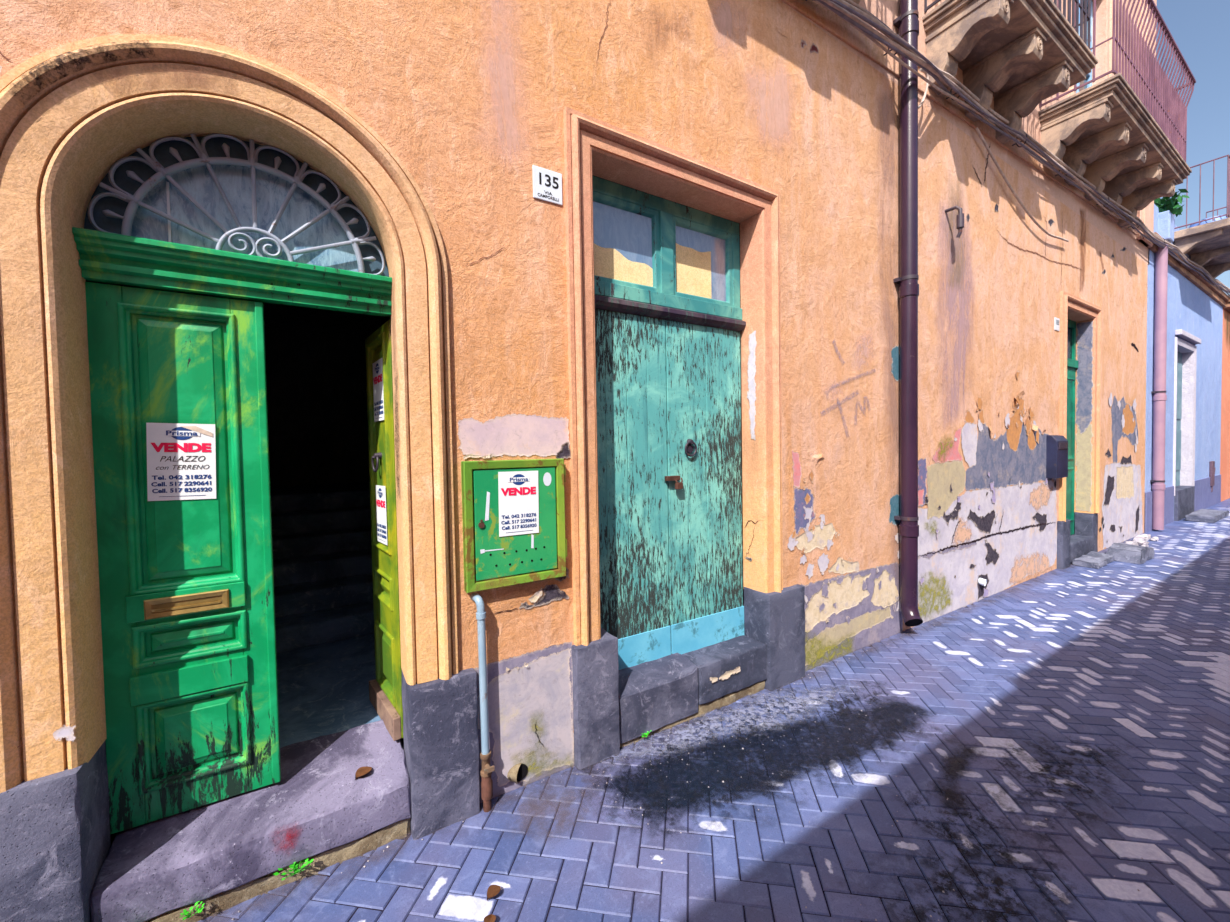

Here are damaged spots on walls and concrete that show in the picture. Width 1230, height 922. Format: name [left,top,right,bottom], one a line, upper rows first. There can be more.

leakage [13,40,155,97]
peeling [891,345,900,381]
flaking render [457,414,571,460]
flaking render [1075,320,1143,549]
flaking render [918,371,1057,623]
peeling [787,450,901,666]
flaking render [497,567,569,613]